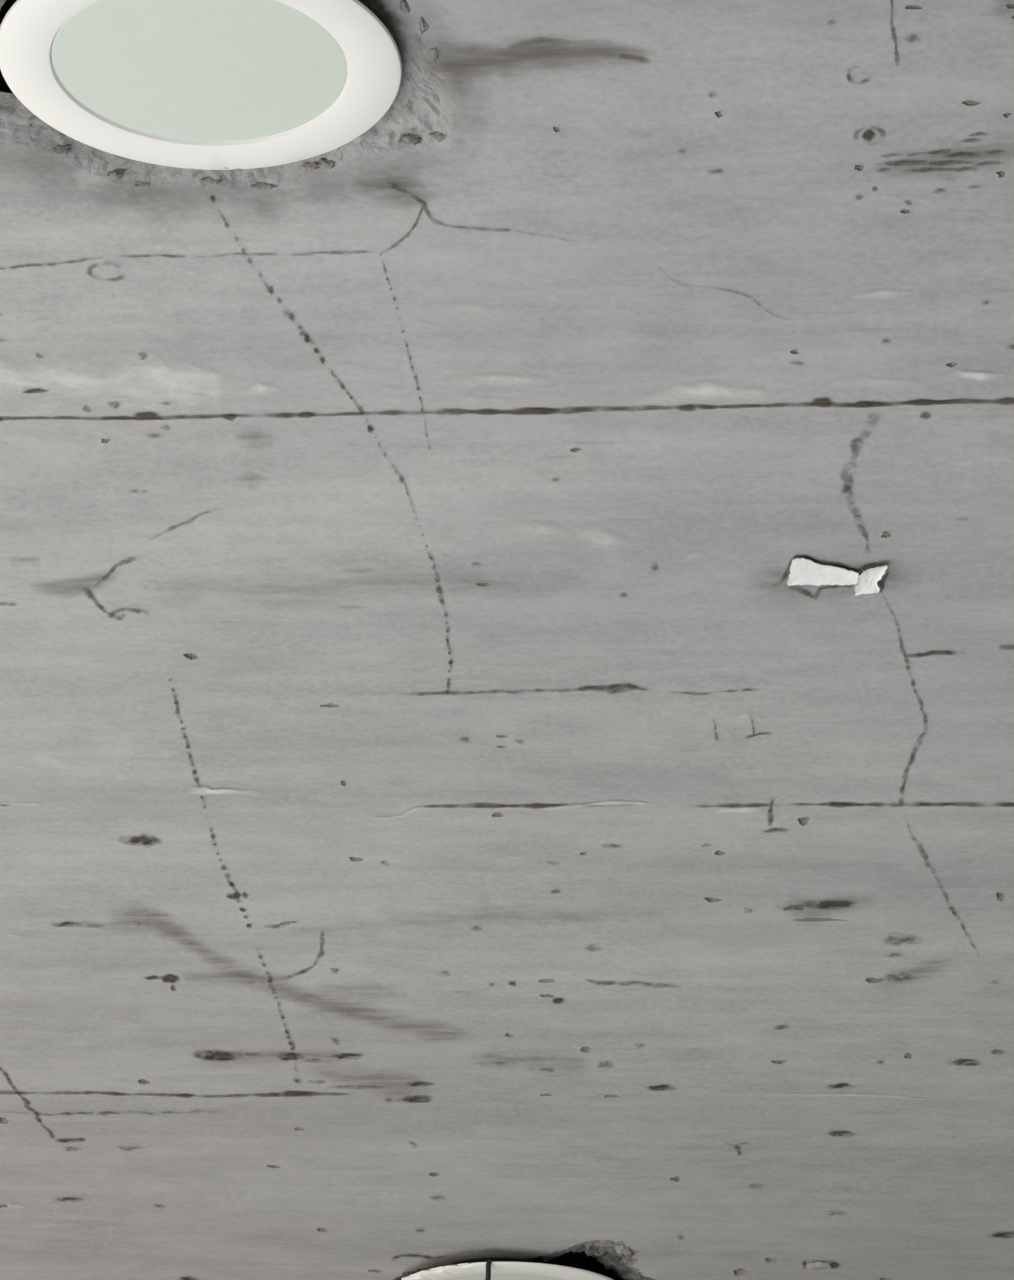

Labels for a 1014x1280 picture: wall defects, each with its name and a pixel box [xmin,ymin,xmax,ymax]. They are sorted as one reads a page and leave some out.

spalling [0,0,458,192]
crack [401,199,462,240]
crack [268,288,373,432]
crack [844,440,867,538]
peeling [783,555,888,598]
crack [420,558,540,696]
crack [578,685,641,693]
crack [891,612,953,802]
crack [211,836,294,927]
crack [0,1068,114,1143]
spalling [368,1265,444,1280]
spalling [521,1240,658,1280]